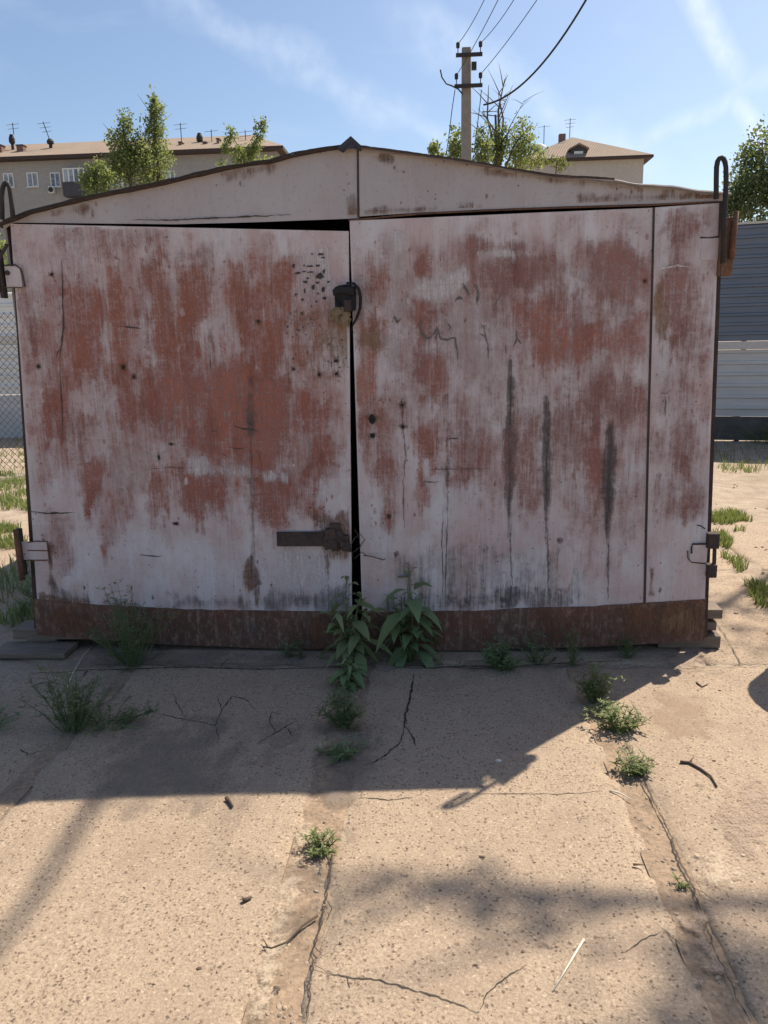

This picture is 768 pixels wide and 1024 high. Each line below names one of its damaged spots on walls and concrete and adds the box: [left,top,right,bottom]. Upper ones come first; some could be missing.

corrosion [240,556,260,603]
leakage [504,360,517,516]
leakage [543,396,551,593]
leakage [602,425,616,598]
crack [136,693,297,743]
crack [364,657,605,766]
crack [306,845,527,1022]
crack [621,744,751,1023]